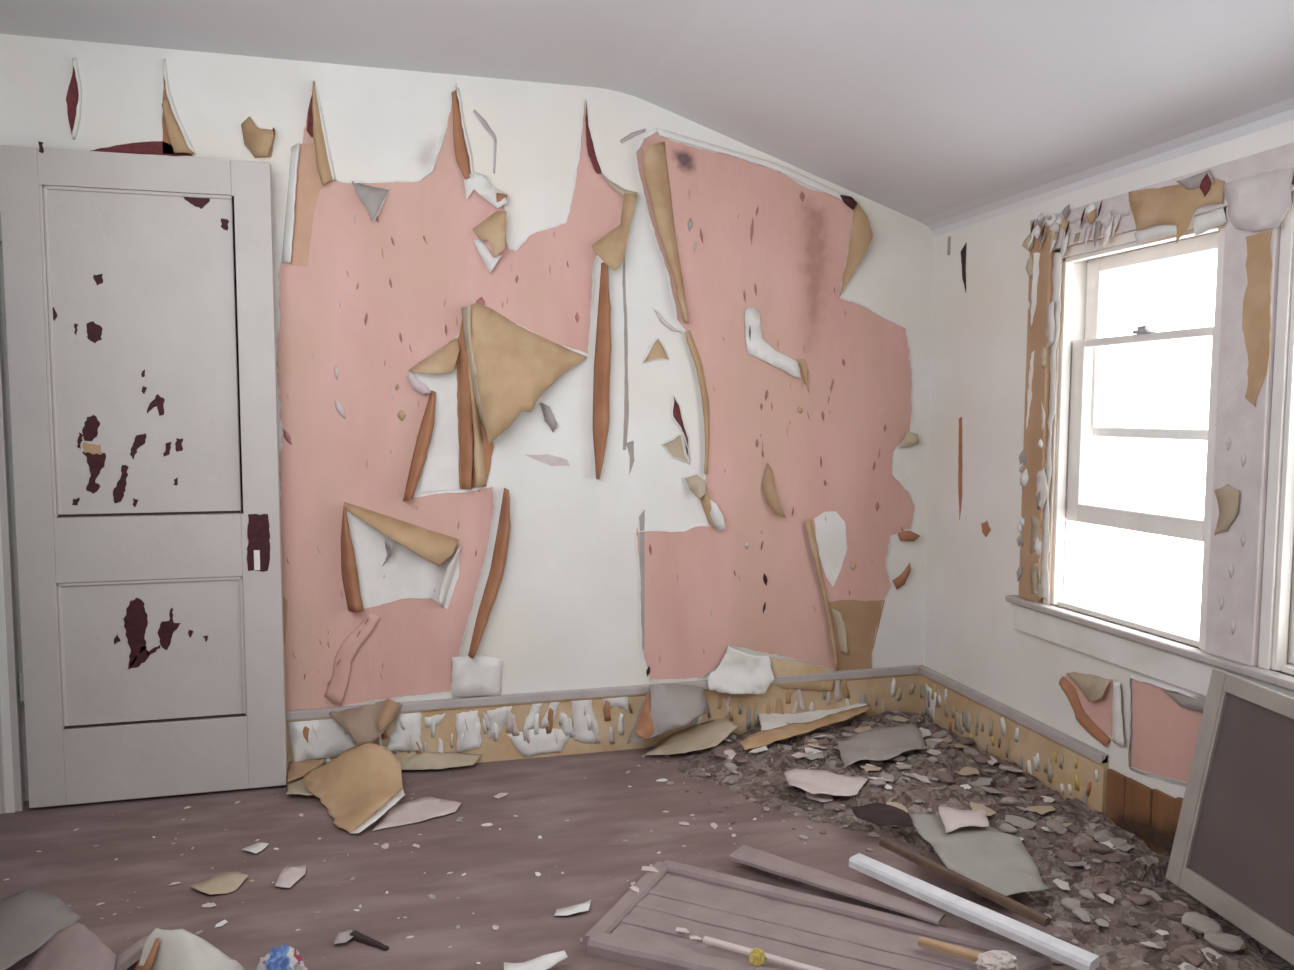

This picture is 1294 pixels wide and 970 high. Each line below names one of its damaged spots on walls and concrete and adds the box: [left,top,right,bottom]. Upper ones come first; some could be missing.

peeling [184,197,210,209]
peeling [1128,170,1227,245]
peeling [74,321,103,343]
peeling [1242,231,1272,407]
peeling [141,370,165,416]
peeling [72,415,147,507]
peeling [163,438,183,456]
peeling [247,80,1098,805]
peeling [114,598,208,670]
peeling [1128,673,1206,787]